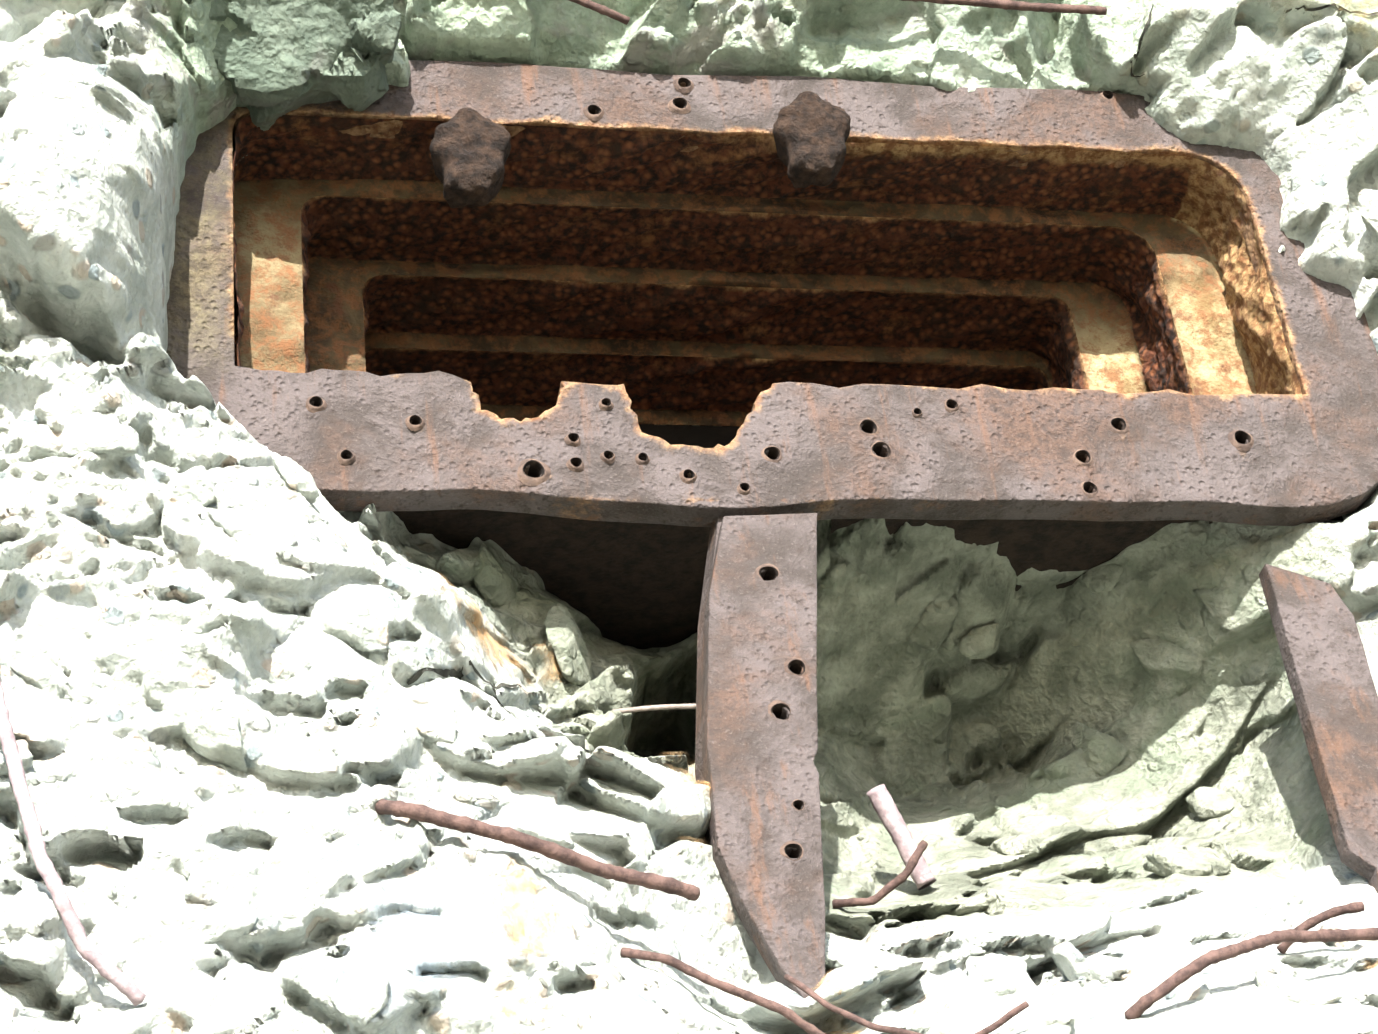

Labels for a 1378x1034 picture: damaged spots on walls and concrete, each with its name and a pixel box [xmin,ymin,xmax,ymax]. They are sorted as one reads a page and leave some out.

spalling [182,0,1378,355]
spalling [0,0,890,1034]
spalling [813,488,1378,1034]